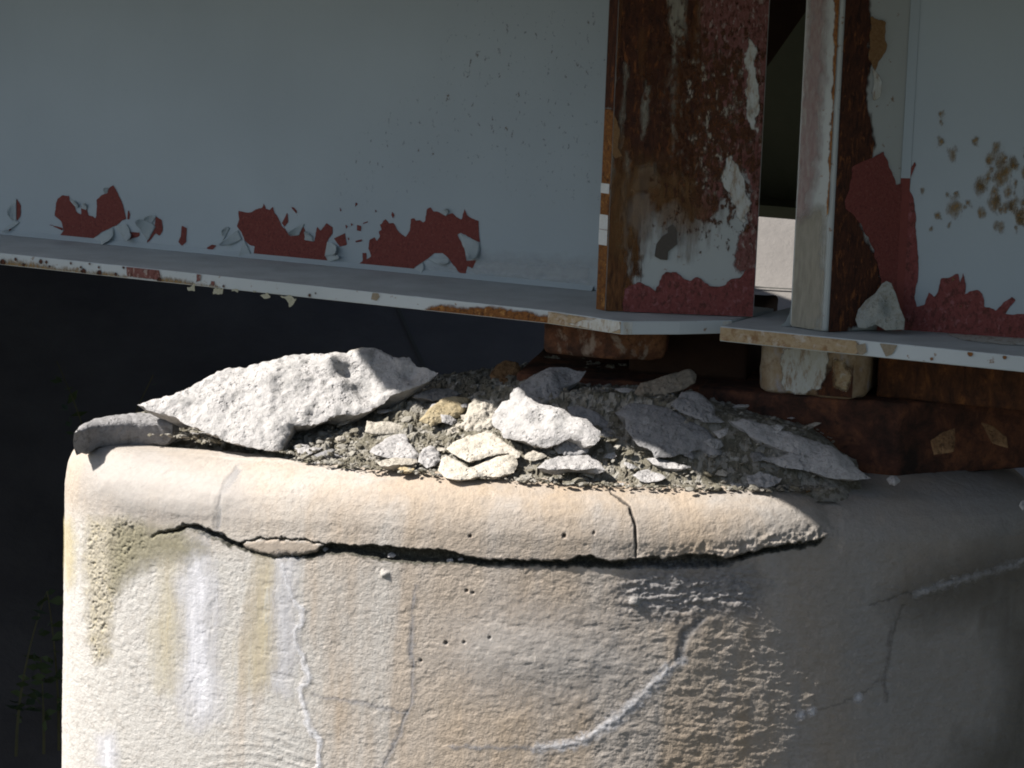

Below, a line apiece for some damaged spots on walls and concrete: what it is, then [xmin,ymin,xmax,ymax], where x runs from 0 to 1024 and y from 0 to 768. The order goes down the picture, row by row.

peeling [51,186,163,244]
peeling [207,204,480,274]
rust [596,0,706,312]
rust [826,0,887,332]
peeling [845,152,1024,338]
rust [929,143,1024,231]
rust [425,305,548,323]
rust [817,361,854,398]
rust [930,428,955,455]
crack [156,469,824,570]
damp [111,526,214,718]